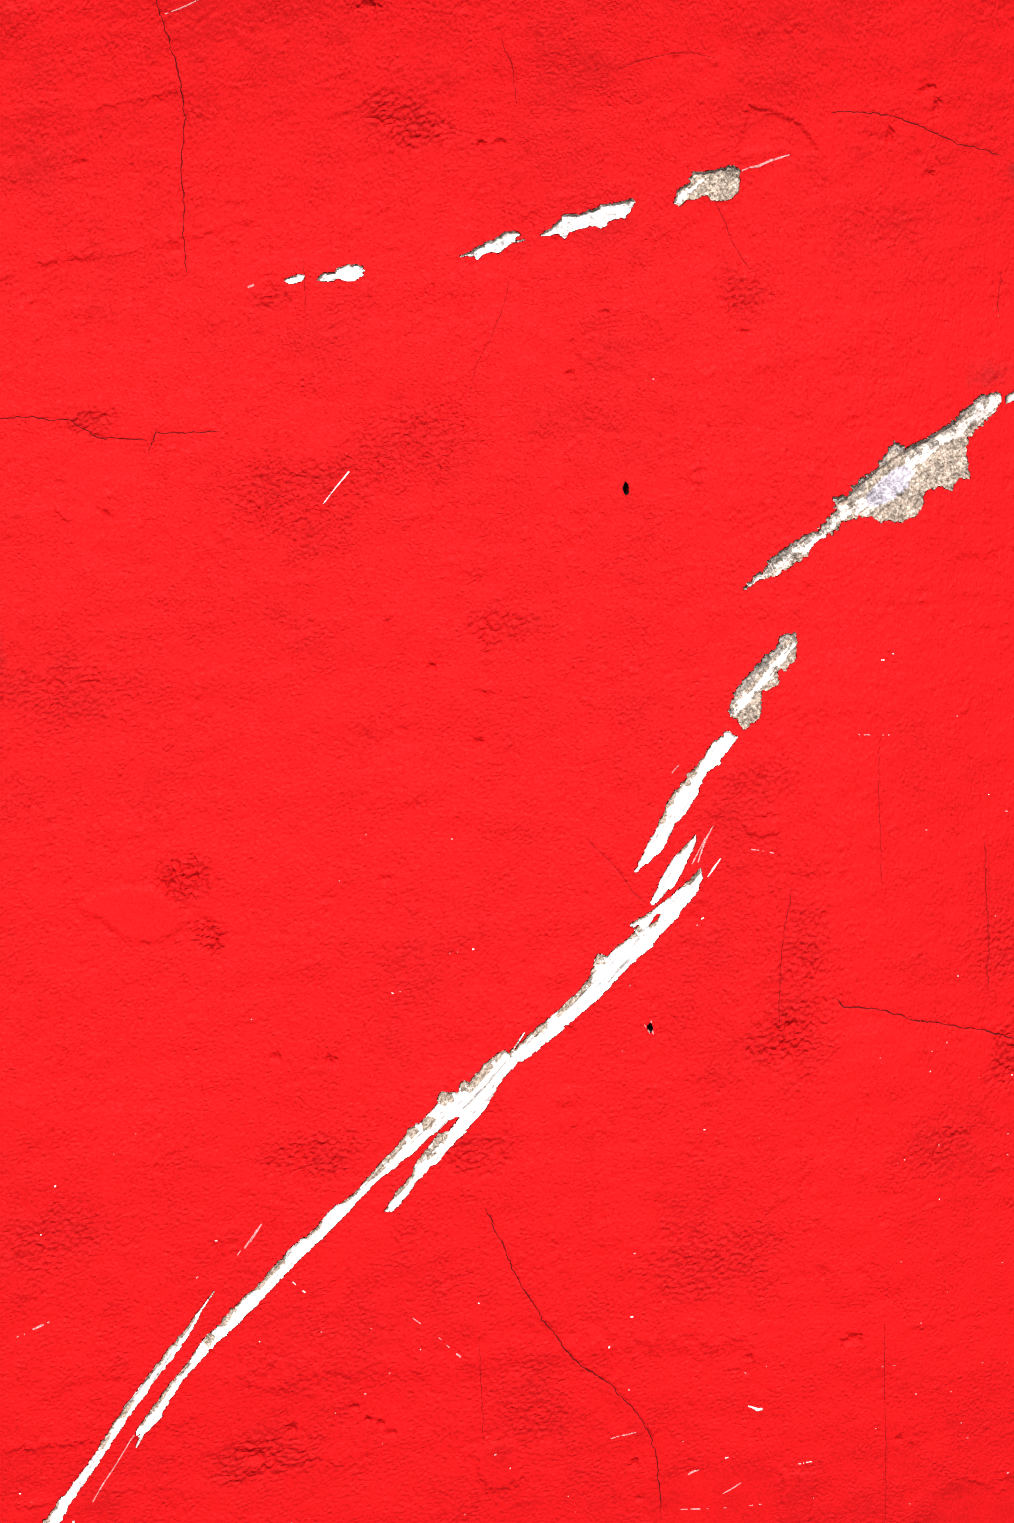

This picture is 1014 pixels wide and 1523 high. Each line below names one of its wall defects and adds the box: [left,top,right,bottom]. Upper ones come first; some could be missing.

peeling [284,264,365,284]
peeling [460,198,635,260]
peeling [674,165,740,206]
spalling [743,391,1014,590]
peeling [340,632,799,1211]
spalling [98,1254,286,1451]